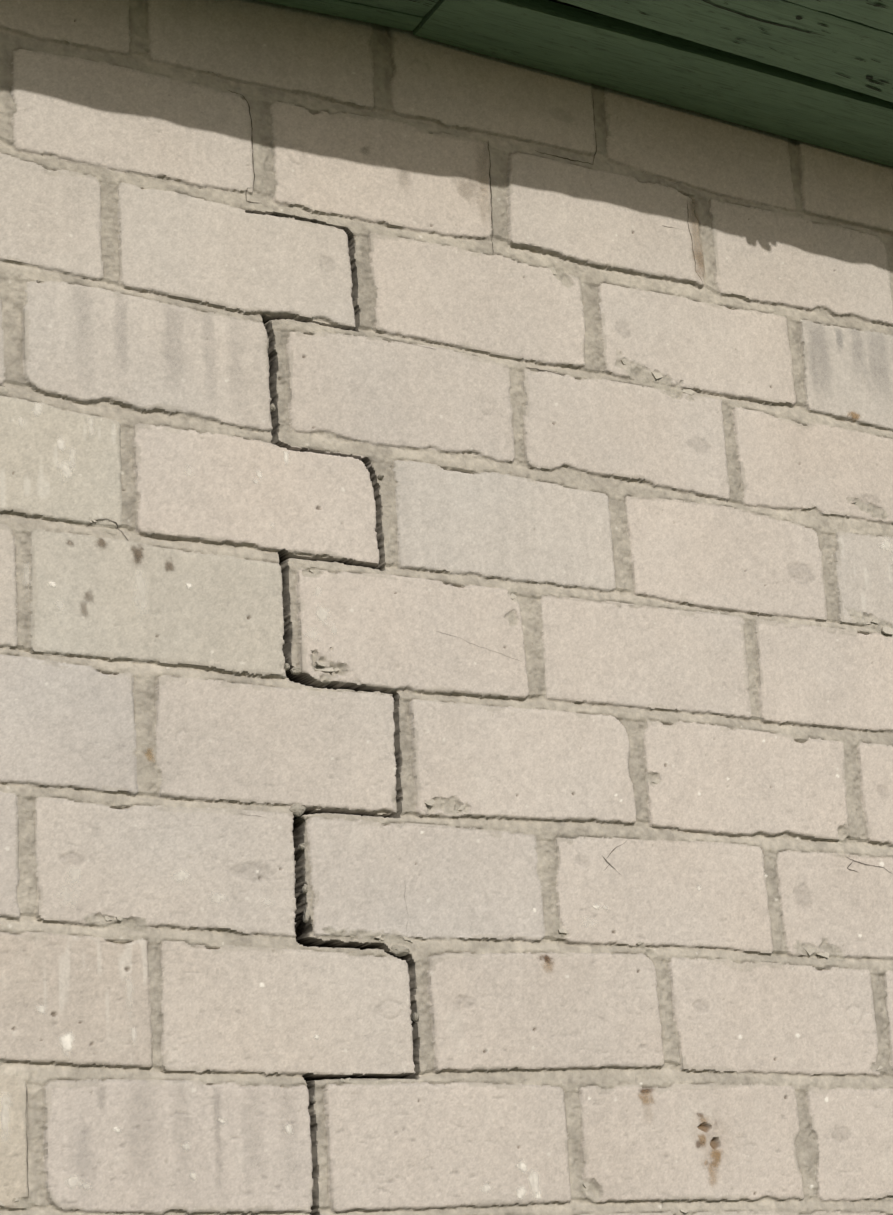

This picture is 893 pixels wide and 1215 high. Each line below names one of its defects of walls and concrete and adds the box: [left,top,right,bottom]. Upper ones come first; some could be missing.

crack [230,91,421,1215]